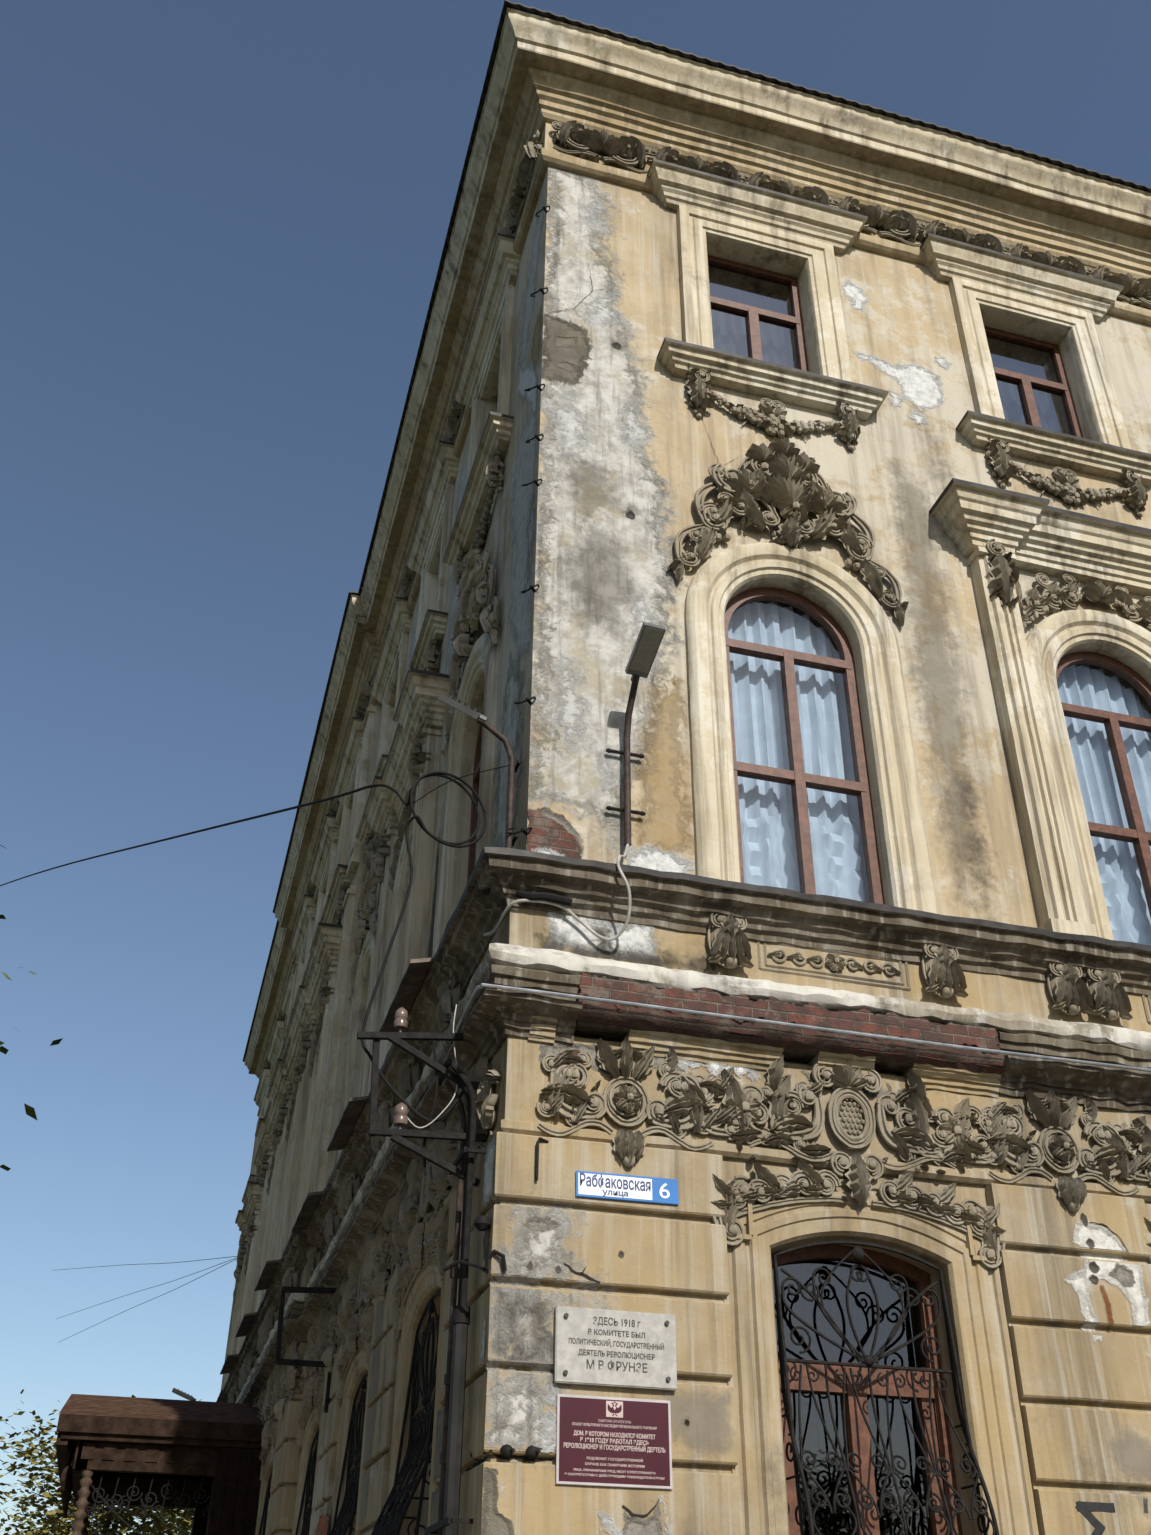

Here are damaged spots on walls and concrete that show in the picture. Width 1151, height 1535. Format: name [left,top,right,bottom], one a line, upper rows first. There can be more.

peeling [852,350,952,424]
peeling [492,166,695,873]
peeling [546,912,660,958]
spalling [539,972,1005,1098]
peeling [480,1138,618,1462]
spalling [1064,1213,1150,1342]
spalling [598,1494,673,1535]